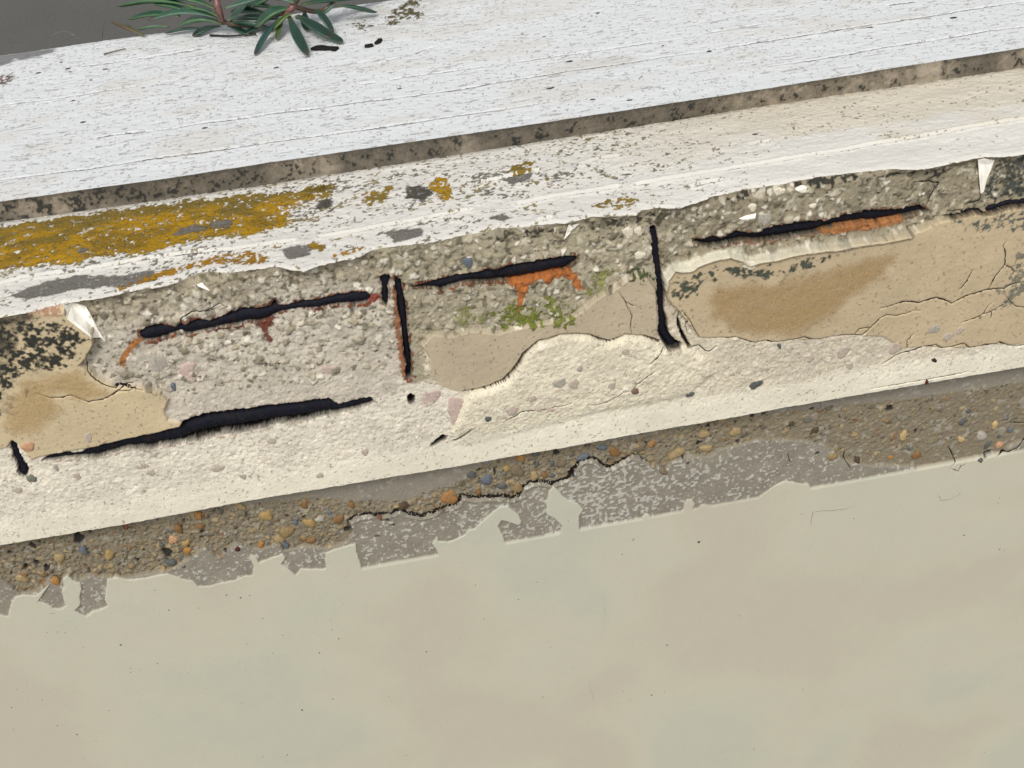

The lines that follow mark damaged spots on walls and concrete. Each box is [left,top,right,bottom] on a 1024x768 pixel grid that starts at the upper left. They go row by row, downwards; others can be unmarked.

rust [820,214,903,235]
water stain [0,313,101,431]
rust [393,290,406,378]
spalling [0,155,1024,616]
rust [505,266,584,315]
crack [598,242,1024,405]
crack [348,453,650,530]